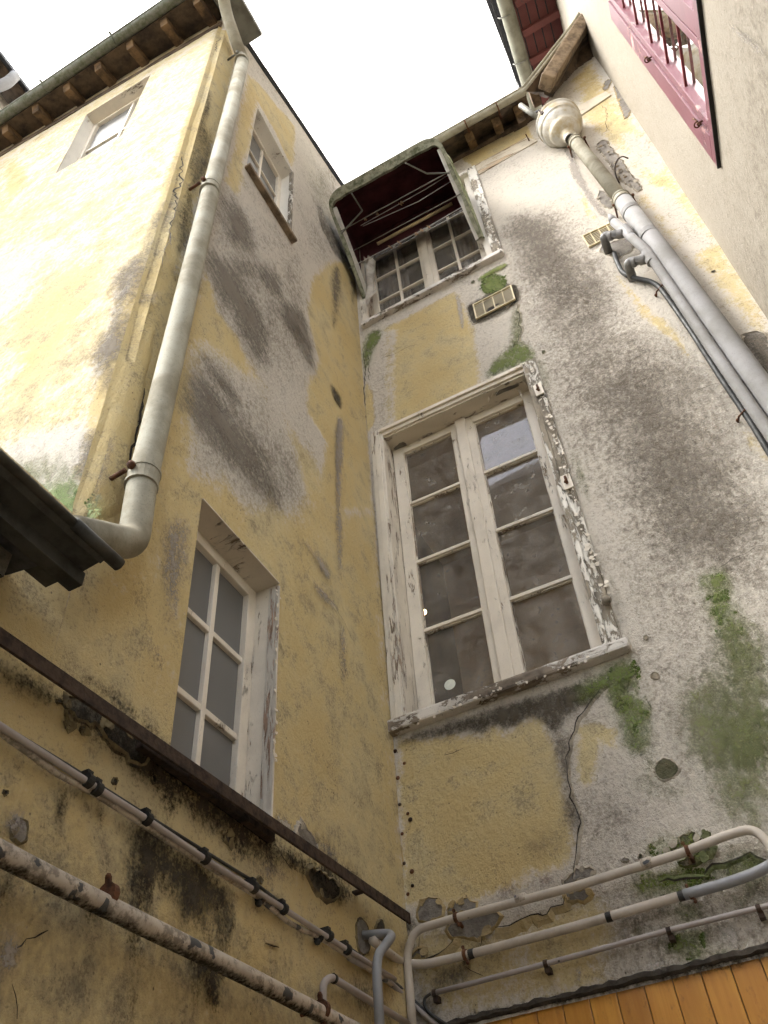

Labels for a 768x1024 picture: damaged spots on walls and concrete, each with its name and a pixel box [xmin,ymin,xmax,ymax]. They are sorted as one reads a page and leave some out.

crack [162,156,184,264]
spalling [596,140,643,192]
damp [282,303,314,365]
damp [185,359,280,506]
peeling [572,488,610,594]
spalling [55,691,157,785]
damp [74,708,357,903]
damp [411,684,601,825]
crack [418,681,611,976]
damp [122,825,236,943]
spalling [416,896,504,943]
spalling [561,864,597,905]